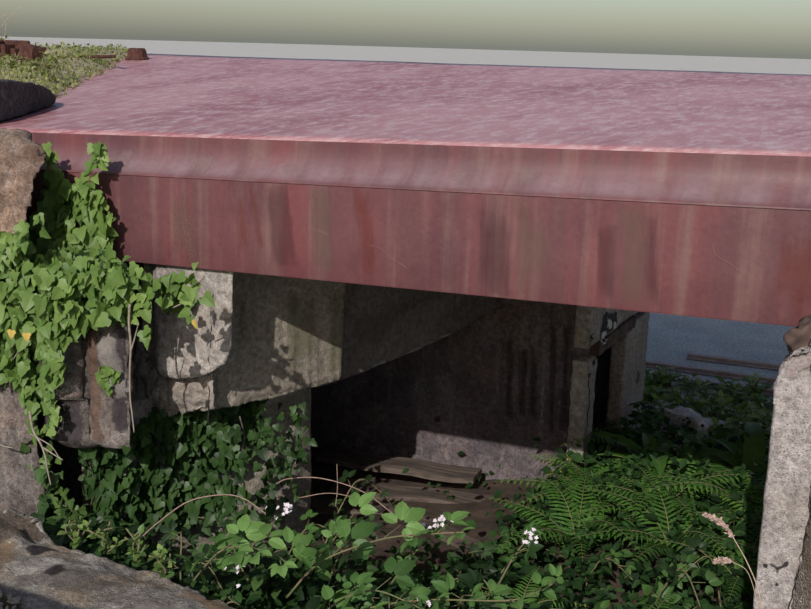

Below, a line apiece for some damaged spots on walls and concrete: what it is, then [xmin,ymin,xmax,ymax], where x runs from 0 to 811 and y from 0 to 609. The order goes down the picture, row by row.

crack [788,495,811,609]